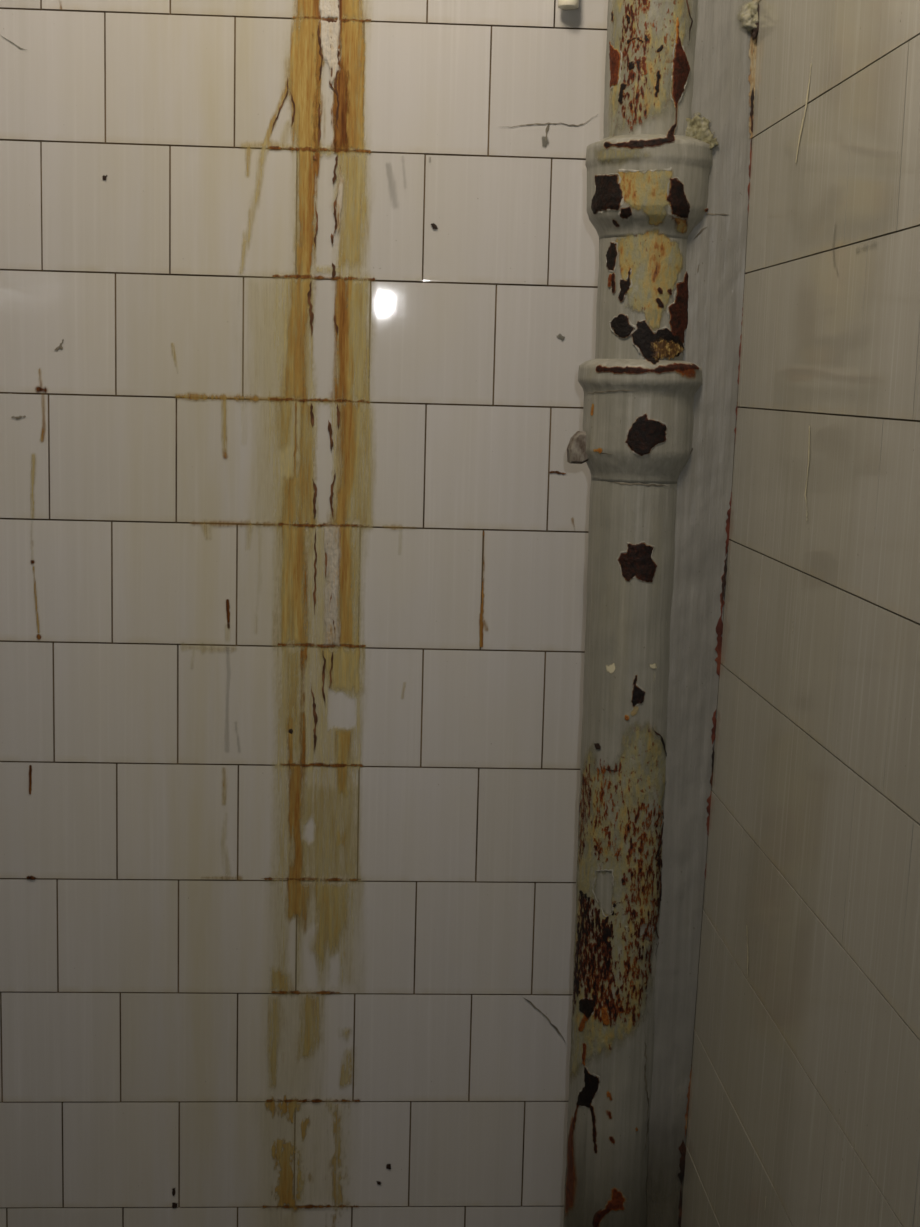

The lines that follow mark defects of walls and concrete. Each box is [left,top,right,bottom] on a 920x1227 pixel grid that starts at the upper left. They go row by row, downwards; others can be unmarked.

peeling [591,0,708,364]
rust [35,369,47,442]
rust [176,0,375,963]
spalling [625,413,668,456]
rust [31,560,41,640]
spalling [616,541,657,582]
rust [262,971,360,1223]
rust [565,1118,576,1215]